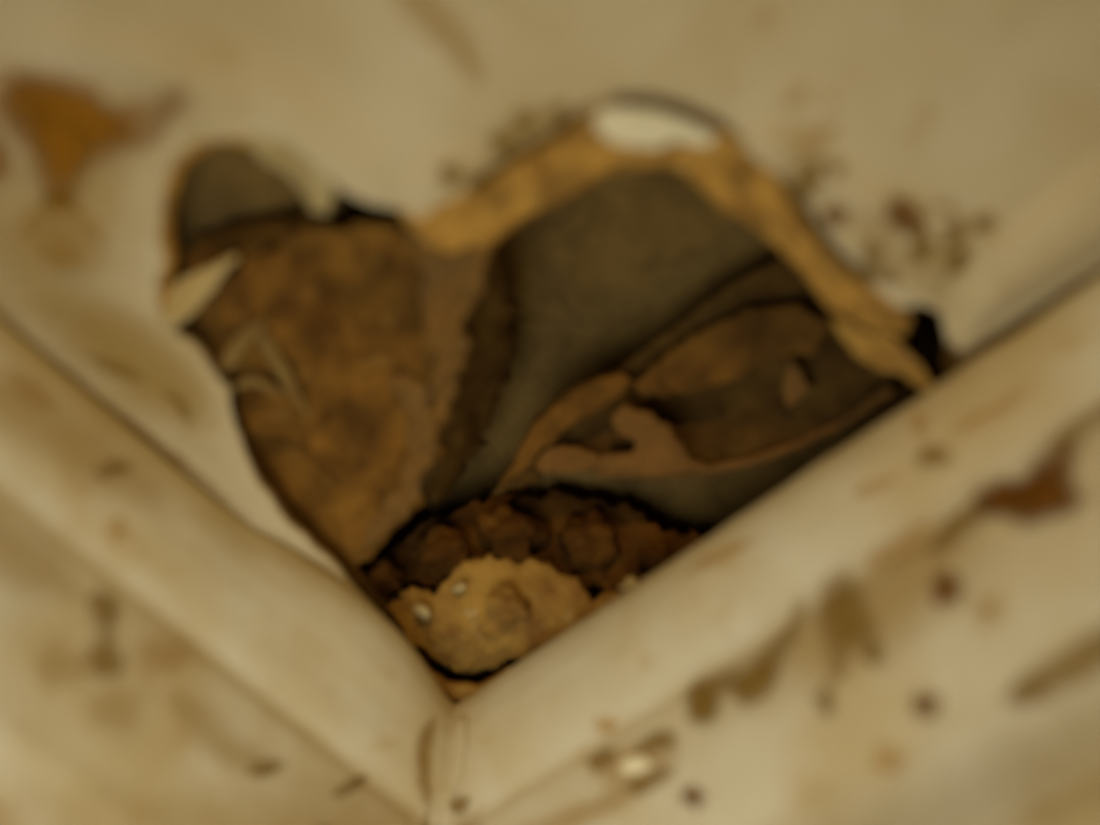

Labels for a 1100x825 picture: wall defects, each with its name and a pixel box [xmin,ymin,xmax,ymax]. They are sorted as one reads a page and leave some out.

leakage [1,79,140,200]
spalling [159,102,949,407]
spalling [175,319,518,684]
spalling [587,586,604,600]
leakage [693,695,713,718]
leakage [740,669,772,702]